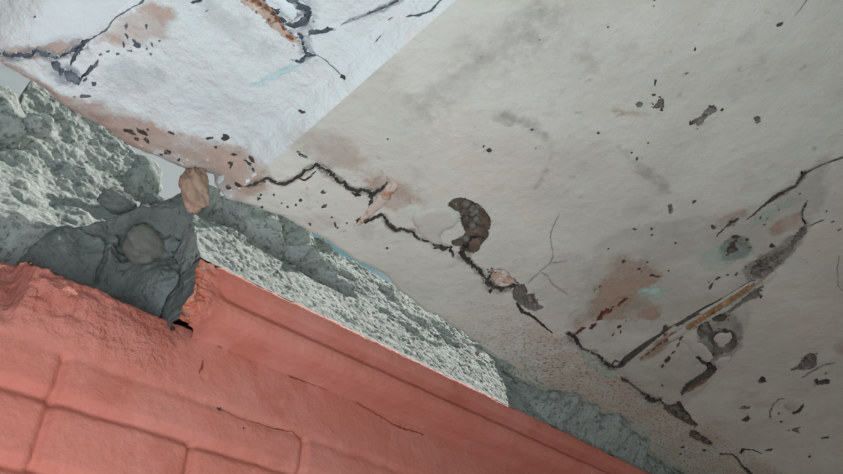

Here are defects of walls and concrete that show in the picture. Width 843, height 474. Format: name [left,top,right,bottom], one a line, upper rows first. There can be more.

crack [0,0,144,86]
crack [273,0,441,75]
spalling [689,105,724,129]
spalling [412,197,491,253]
crack [711,156,843,237]
crack [242,151,664,405]
spalling [487,267,543,311]
corrosion [574,298,628,335]
spalling [618,226,808,451]
crack [355,401,424,435]